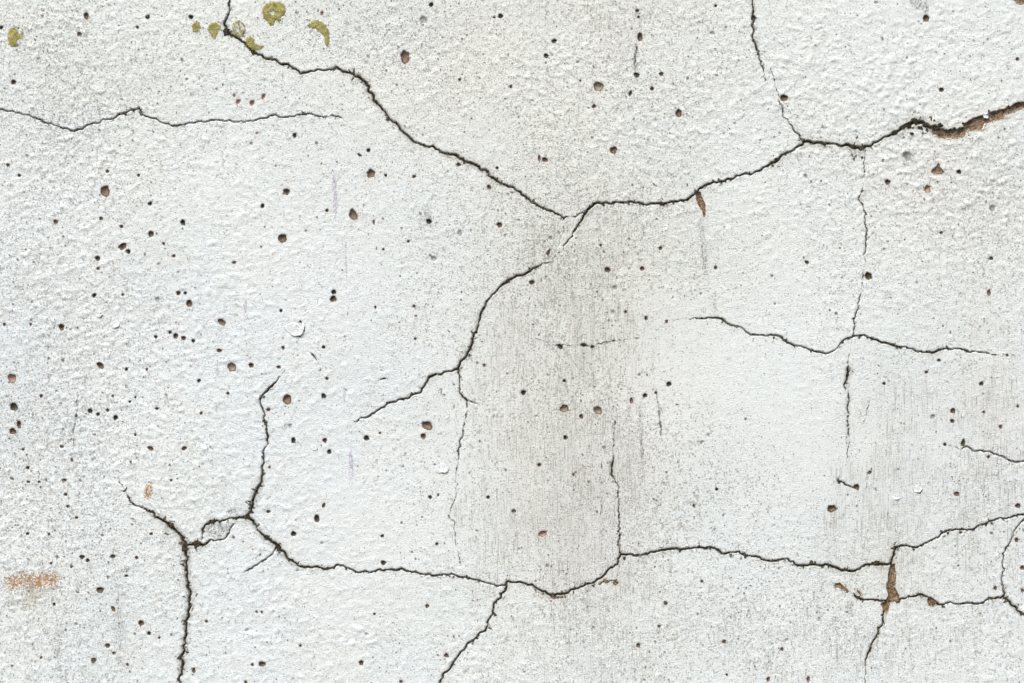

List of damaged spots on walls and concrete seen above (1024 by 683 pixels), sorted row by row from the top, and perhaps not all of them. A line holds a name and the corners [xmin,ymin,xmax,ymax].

crack [0,107,344,132]
crack [223,0,1024,565]
crack [118,370,1024,683]